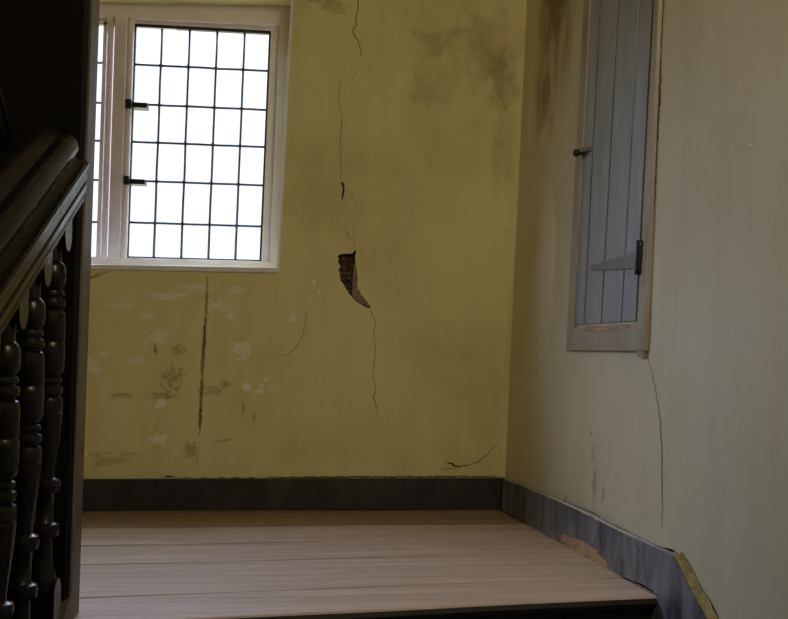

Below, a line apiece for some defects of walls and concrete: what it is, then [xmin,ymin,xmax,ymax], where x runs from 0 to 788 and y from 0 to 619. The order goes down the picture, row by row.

crack [338,0,362,172]
flaking render [337,250,370,308]
crack [443,445,499,470]
peeling [560,534,608,568]